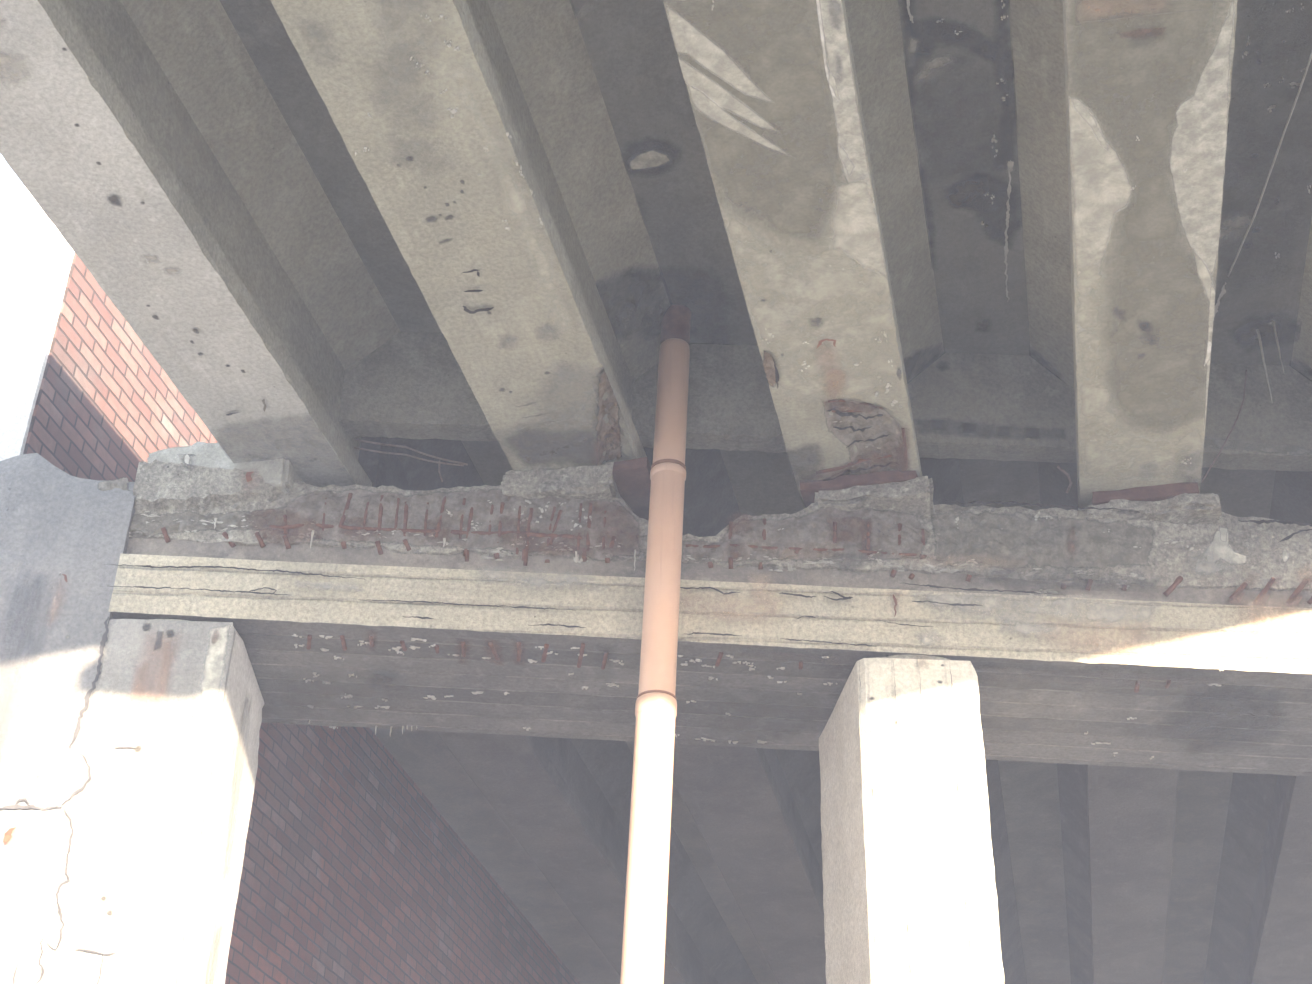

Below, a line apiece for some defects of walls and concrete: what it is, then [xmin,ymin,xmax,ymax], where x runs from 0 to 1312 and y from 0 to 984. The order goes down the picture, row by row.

damp [904,0,1020,302]
damp [1195,255,1226,437]
spalling [594,371,622,466]
spalling [809,399,1064,482]
spalling [129,489,640,566]
spalling [682,507,1155,591]
crack [688,630,742,638]
crack [0,564,586,984]